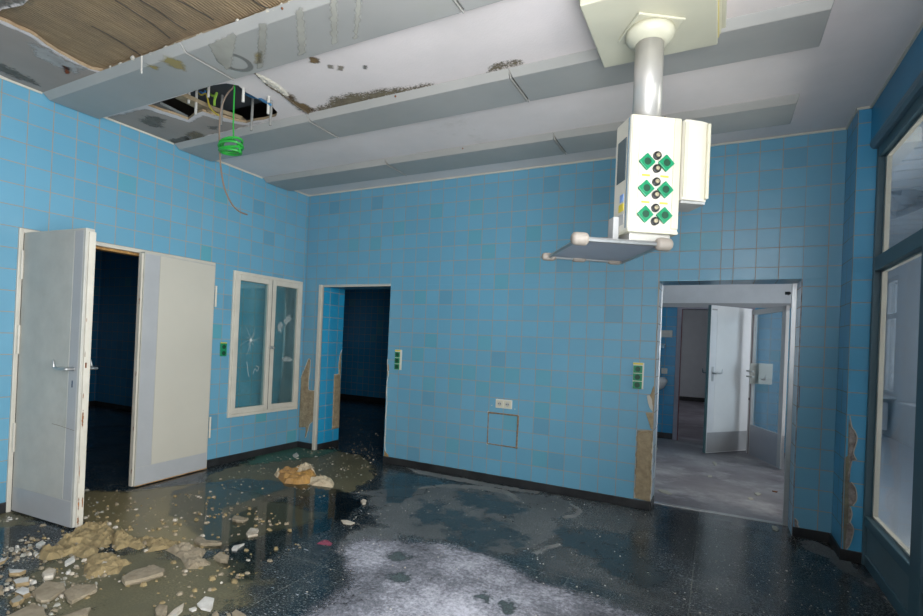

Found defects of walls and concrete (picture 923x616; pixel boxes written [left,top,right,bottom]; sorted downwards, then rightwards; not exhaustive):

spalling [299,358,314,438]
spalling [332,350,342,429]
spalling [634,386,654,502]
spalling [841,416,858,549]
water stain [306,468,671,616]